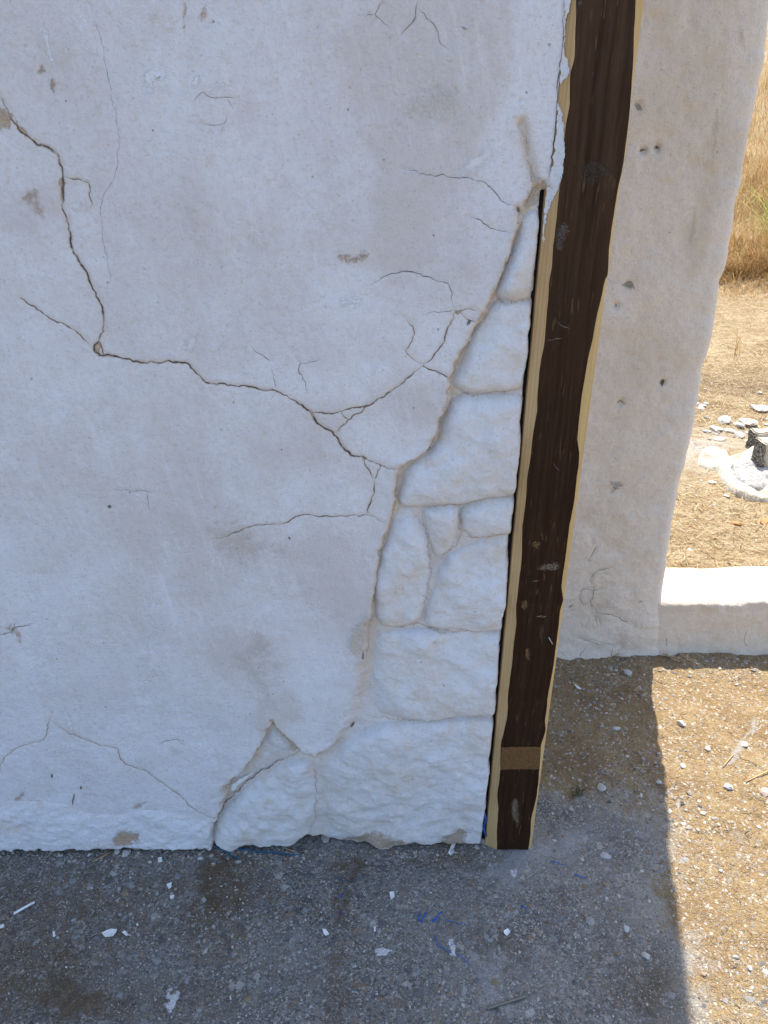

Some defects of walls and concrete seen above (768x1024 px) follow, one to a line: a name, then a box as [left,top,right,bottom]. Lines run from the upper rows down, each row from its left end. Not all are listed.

crack [4,24,475,536]
peeling [559,0,571,84]